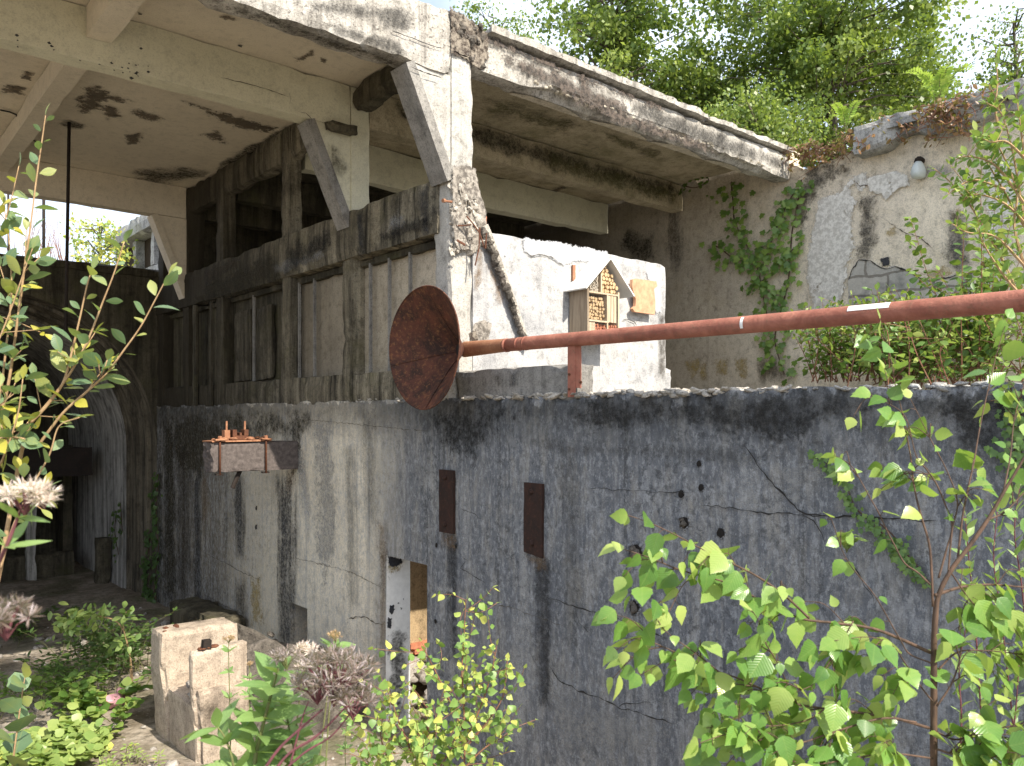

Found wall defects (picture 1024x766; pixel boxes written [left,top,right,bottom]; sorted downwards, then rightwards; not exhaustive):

damp [484,34,783,167]
damp [137,168,206,183]
damp [472,127,678,203]
spalling [447,165,507,266]
peeling [523,237,608,266]
peeling [806,157,1020,309]
peeling [646,271,663,314]
damp [435,404,525,457]
damp [163,411,335,643]
crack [590,449,934,543]
crack [550,667,672,724]